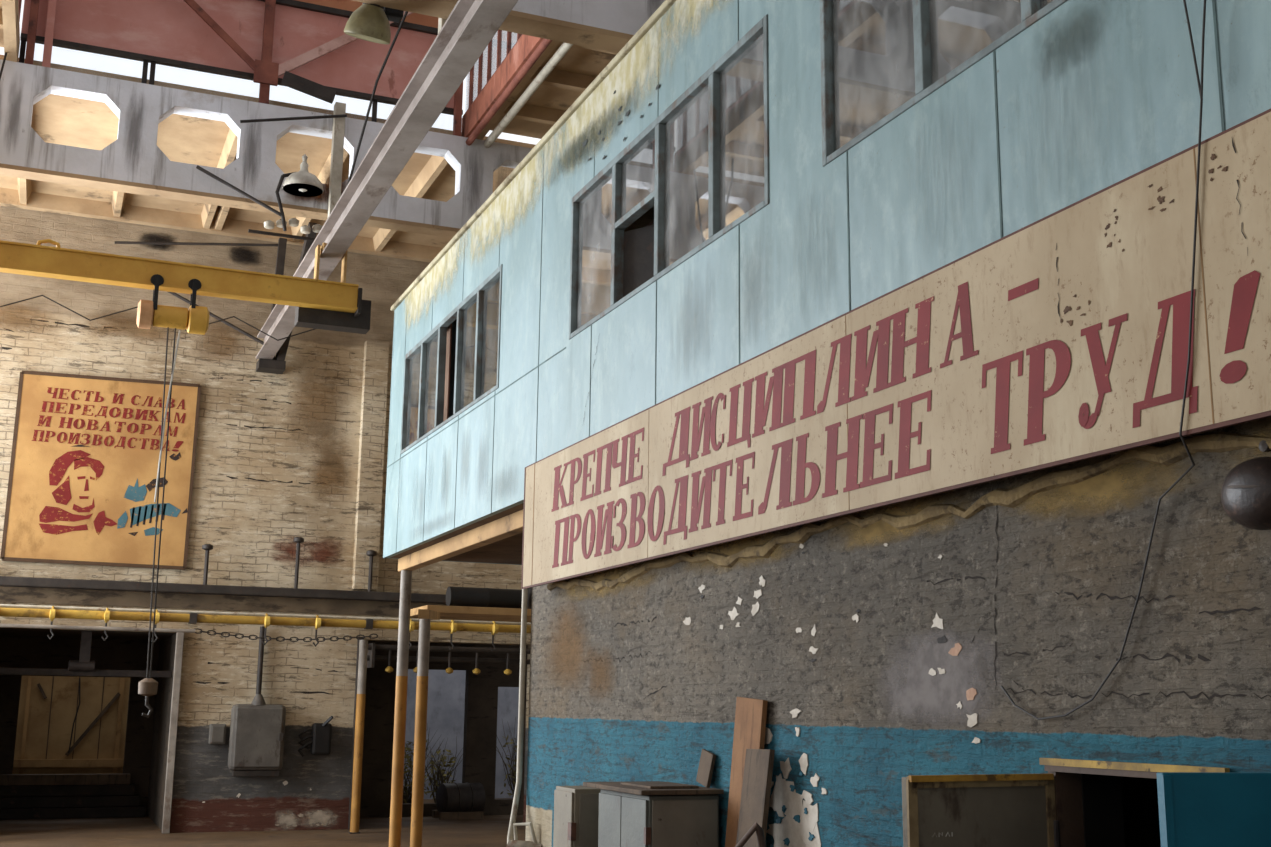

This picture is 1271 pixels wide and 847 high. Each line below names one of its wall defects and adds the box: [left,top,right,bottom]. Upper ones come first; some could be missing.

leakage [405,0,713,326]
leakage [319,451,342,489]
peeling [719,575,766,629]
peeling [796,624,819,663]
spalling [931,612,962,656]
peeling [790,708,802,737]
spalling [956,688,981,744]
peeling [767,753,827,847]